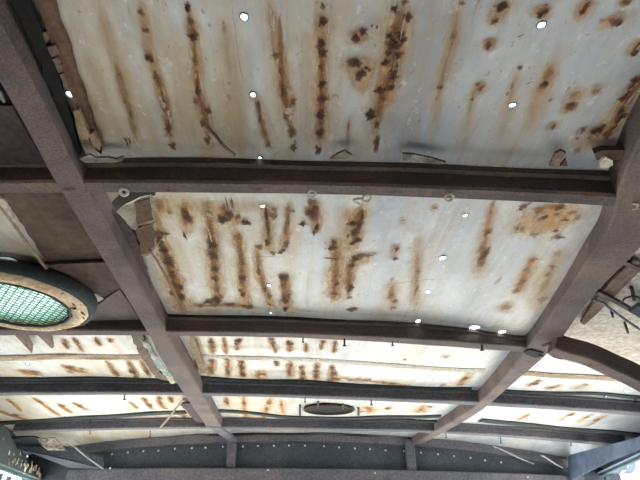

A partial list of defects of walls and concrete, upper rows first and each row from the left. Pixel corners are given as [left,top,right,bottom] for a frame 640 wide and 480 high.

peeling [79,153,124,163]
rust [138,8,176,150]
rust [184,4,212,145]
rust [269,7,297,152]
rust [312,2,329,154]
rust [346,0,412,152]
rust [576,76,640,140]
rust [134,198,296,312]
rust [324,204,373,301]
rust [34,398,88,415]
rust [194,338,246,377]
rust [274,361,371,383]